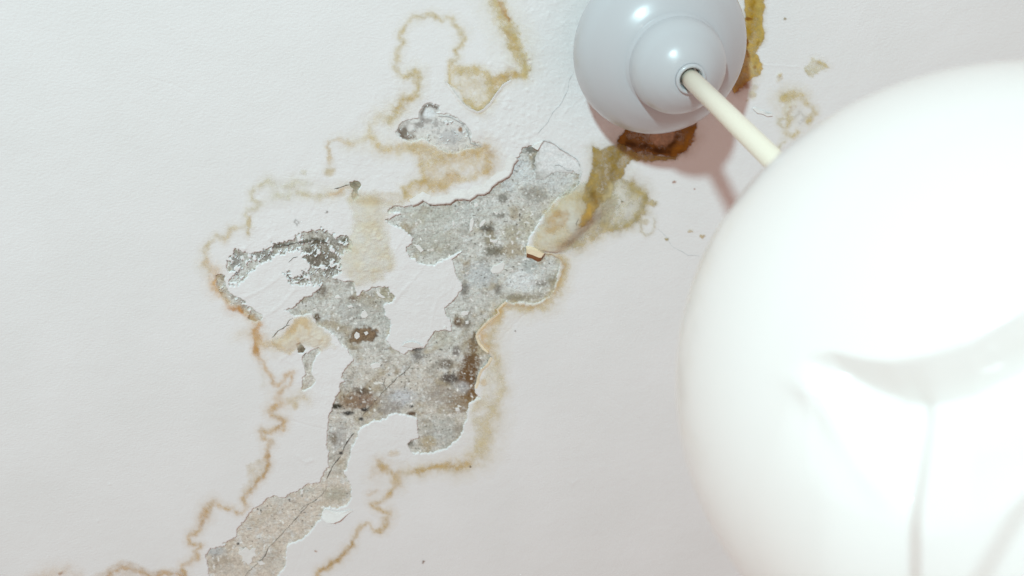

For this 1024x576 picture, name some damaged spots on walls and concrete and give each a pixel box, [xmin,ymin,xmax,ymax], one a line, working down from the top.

water stain [449,0,530,111]
peeling [396,79,512,153]
water stain [404,148,490,198]
water stain [570,143,677,248]
spalling [206,140,583,576]
water stain [481,256,567,359]
water stain [416,462,470,473]